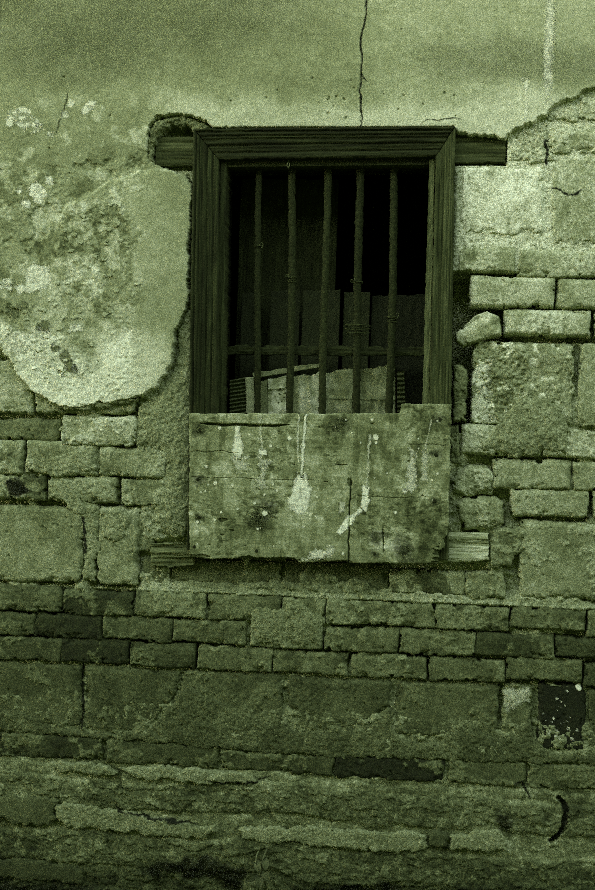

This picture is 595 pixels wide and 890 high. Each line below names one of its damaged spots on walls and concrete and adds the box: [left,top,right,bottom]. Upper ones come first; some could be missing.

crack [359,1,368,127]
spalling [147,116,212,165]
spalling [455,311,502,348]
spalling [452,463,525,601]